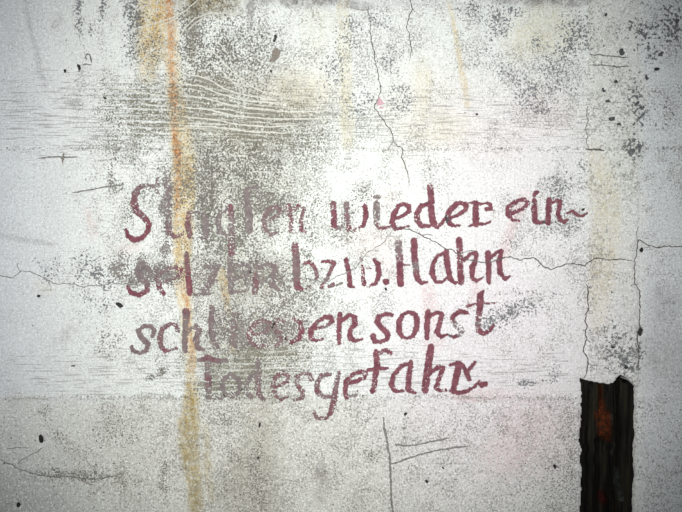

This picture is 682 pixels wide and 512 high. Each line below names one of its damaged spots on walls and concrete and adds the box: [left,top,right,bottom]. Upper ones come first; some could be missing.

crack [351,7,410,186]
crack [406,0,415,61]
crack [0,263,210,291]
crack [303,227,682,378]